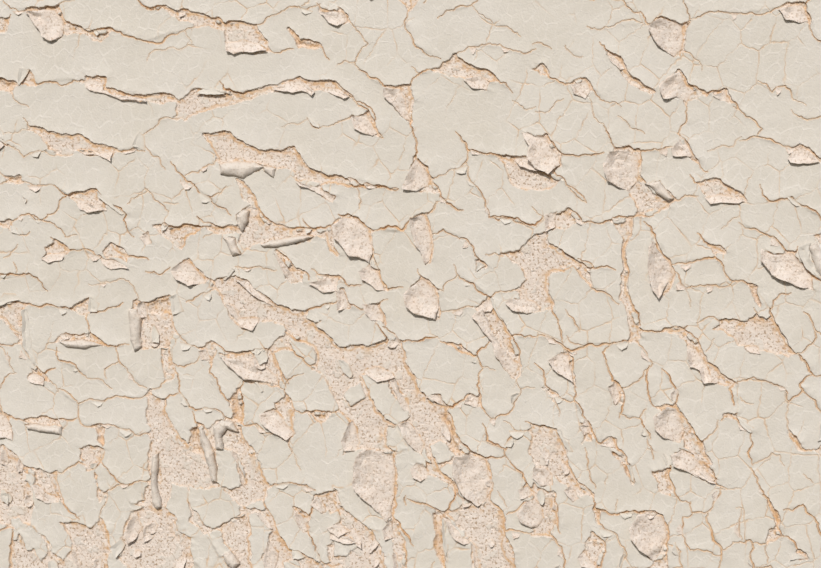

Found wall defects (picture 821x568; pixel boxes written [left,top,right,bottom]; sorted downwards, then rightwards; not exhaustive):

crack [0,0,207,62]
peeling [145,4,331,61]
peeling [586,0,704,72]
peeling [775,0,821,43]
peeling [81,74,385,140]
crack [429,130,544,227]
crack [0,212,140,316]
peeling [484,41,821,505]
crack [0,315,234,438]
peeling [0,84,597,568]
crack [381,325,533,460]
crack [665,326,821,568]